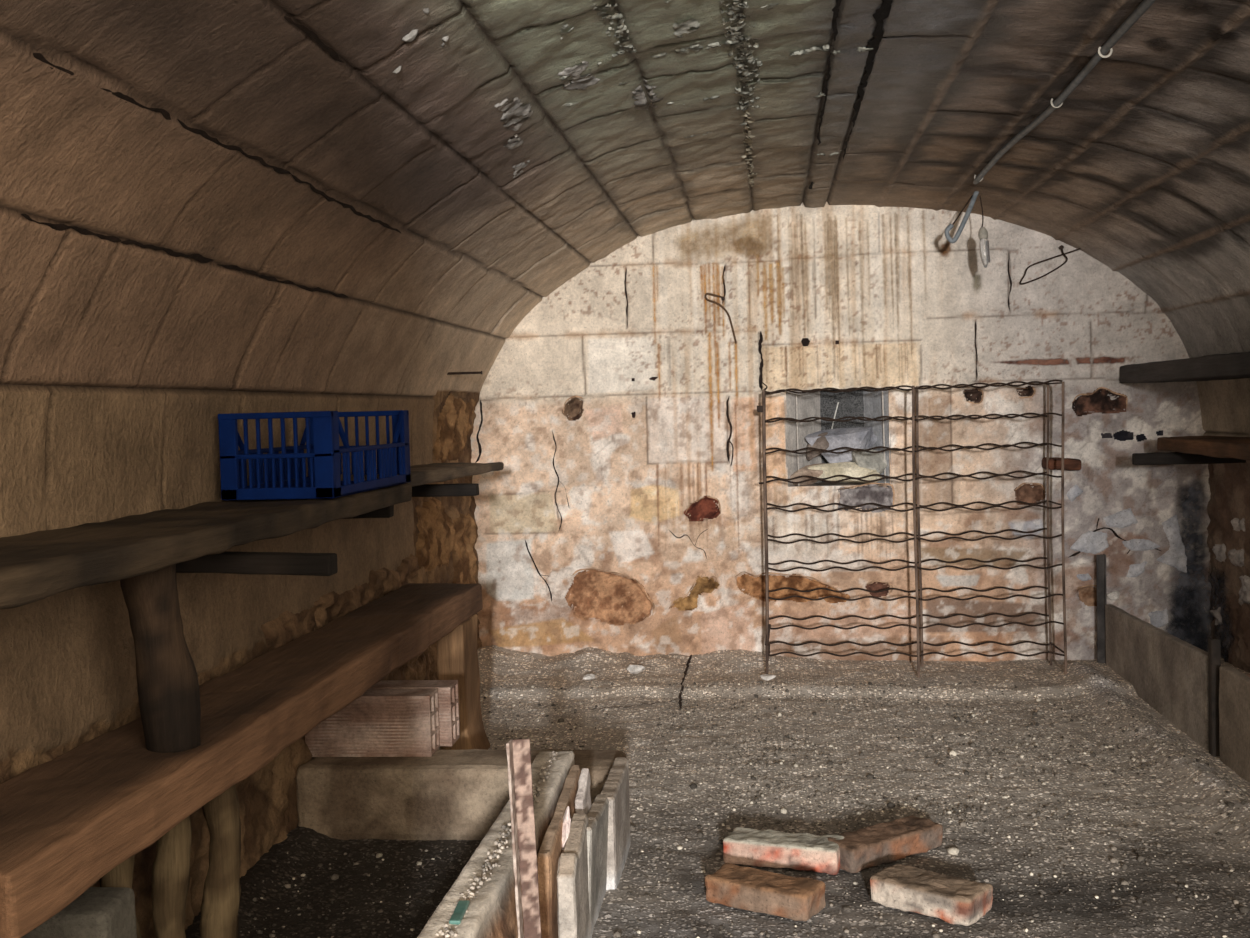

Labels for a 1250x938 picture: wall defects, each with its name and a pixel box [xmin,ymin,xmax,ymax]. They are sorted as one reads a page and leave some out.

peeling [402,29,418,42]
rust [758,262,784,333]
rust [700,266,738,465]
spalling [684,496,721,521]
peeling [1231,518,1246,531]
spalling [565,568,720,626]
spalling [735,572,851,603]
spalling [865,580,893,597]
water stain [1165,482,1234,662]
peeling [1210,607,1223,625]
peeling [1212,544,1250,606]
crack [590,655,692,710]